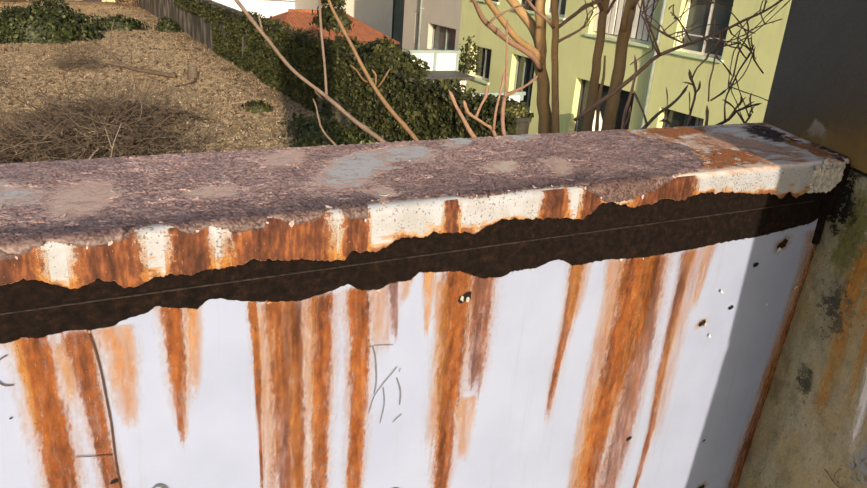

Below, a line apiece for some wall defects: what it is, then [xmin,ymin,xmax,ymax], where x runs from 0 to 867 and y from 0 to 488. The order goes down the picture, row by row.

rust [15,327,134,488]
rust [248,293,333,488]
rust [347,289,370,488]
peeling [0,123,848,344]
rust [434,271,493,488]
rust [547,265,583,408]
rust [573,255,665,488]
rust [627,175,699,208]
rust [634,249,711,488]
rust [635,114,867,174]
leakage [816,168,867,342]
leakage [852,368,867,441]